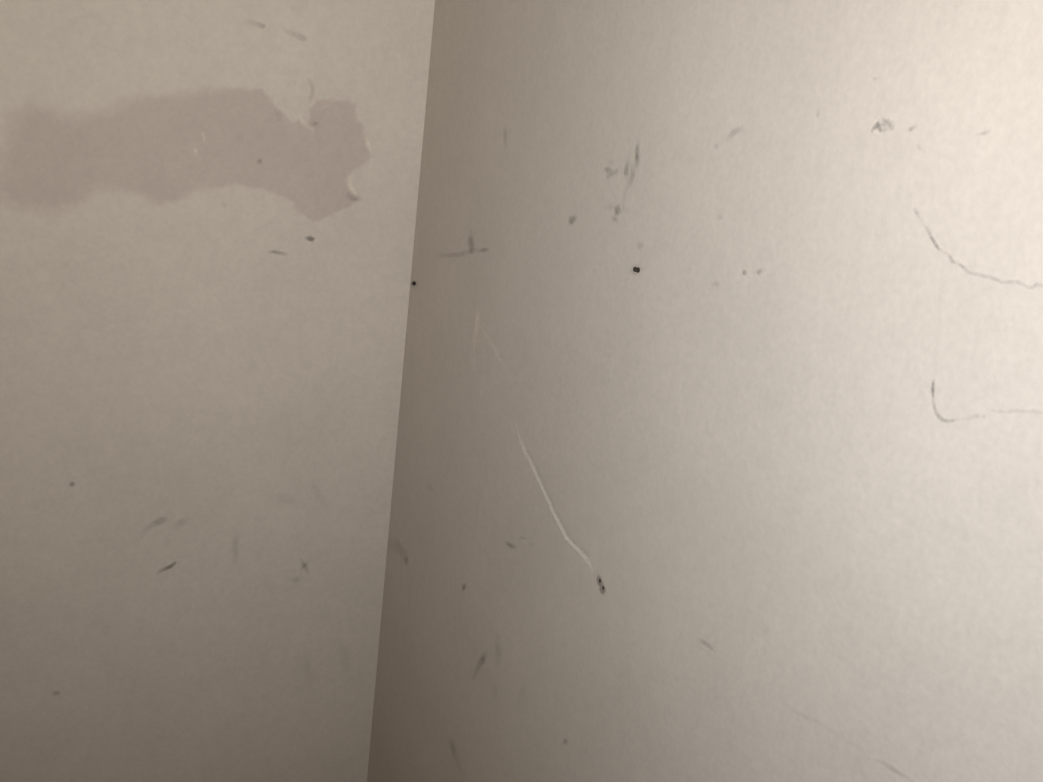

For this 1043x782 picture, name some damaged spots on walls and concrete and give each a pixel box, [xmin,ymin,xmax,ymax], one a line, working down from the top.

peeling [0,82,373,225]